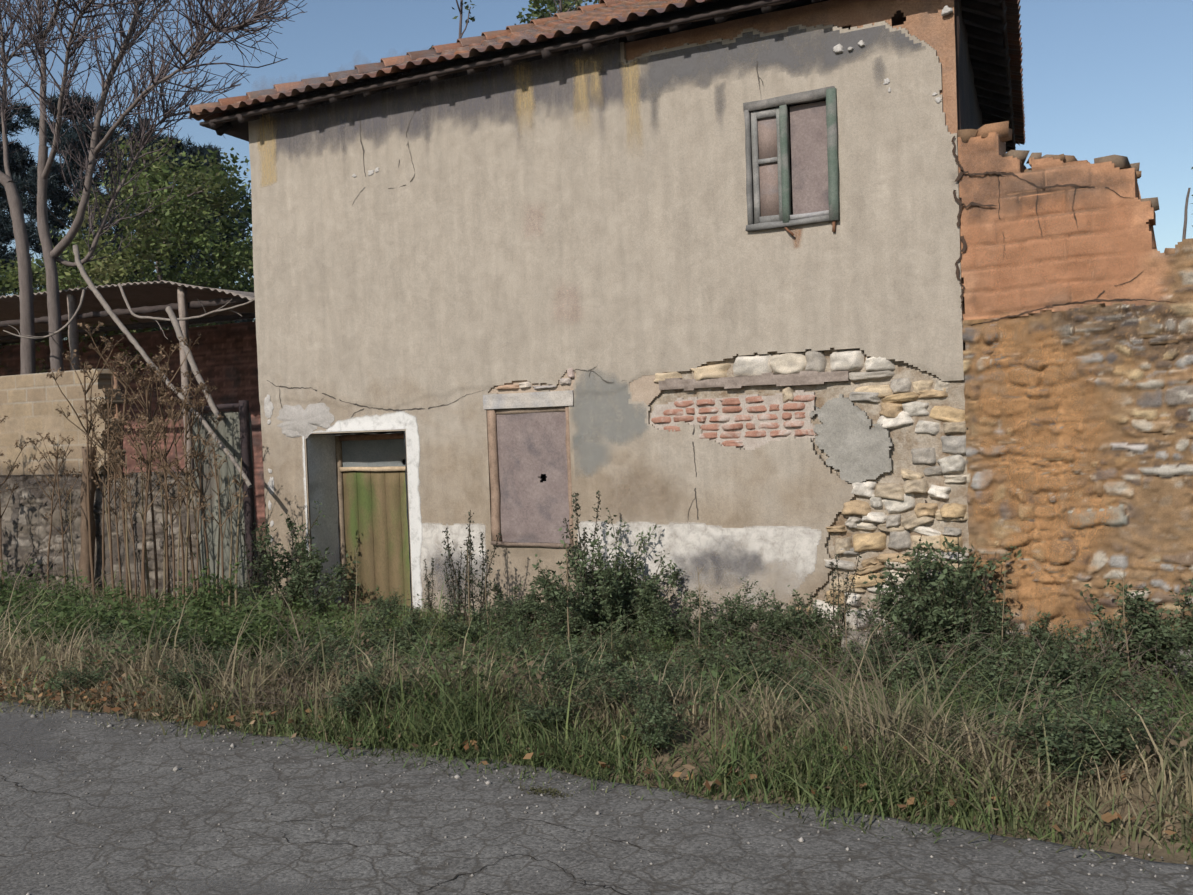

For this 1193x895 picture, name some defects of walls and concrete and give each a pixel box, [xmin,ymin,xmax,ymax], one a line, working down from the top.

leakage [260,24,922,152]
spalling [625,0,958,134]
crack [951,136,1179,326]
crack [267,380,483,416]
spalling [630,348,970,644]